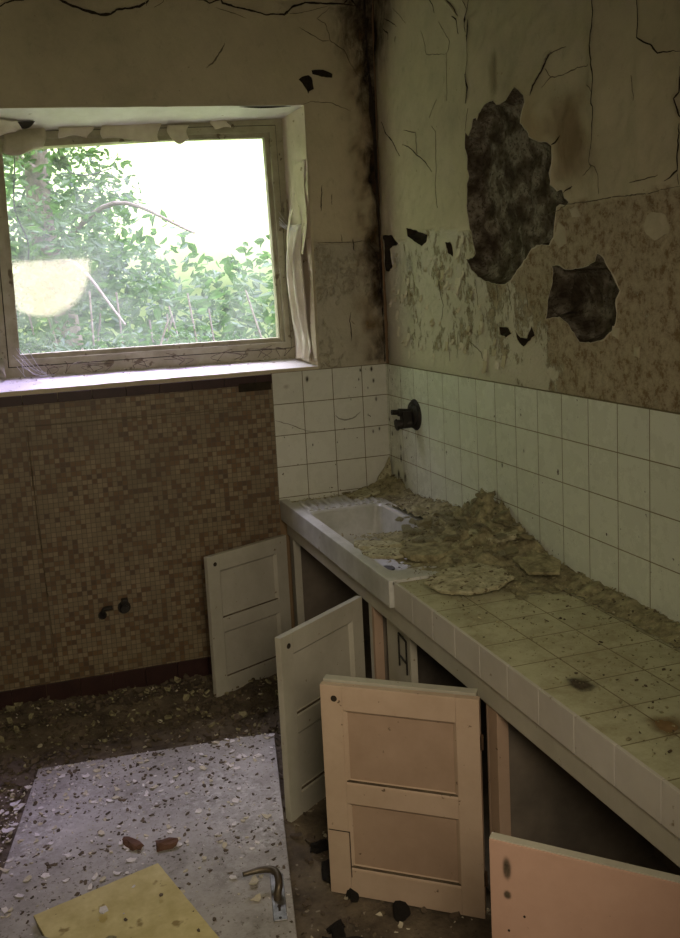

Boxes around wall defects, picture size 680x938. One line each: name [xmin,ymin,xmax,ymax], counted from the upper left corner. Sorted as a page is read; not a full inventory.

crack [60,0,164,16]
crack [203,0,362,78]
peeling [0,119,46,156]
peeling [58,123,189,144]
peeling [298,69,333,94]
crack [381,0,468,208]
crack [529,0,680,217]
leakage [346,0,385,362]
spalling [464,86,581,285]
spalling [382,228,428,272]
spalling [499,326,535,347]
spalling [545,253,620,343]